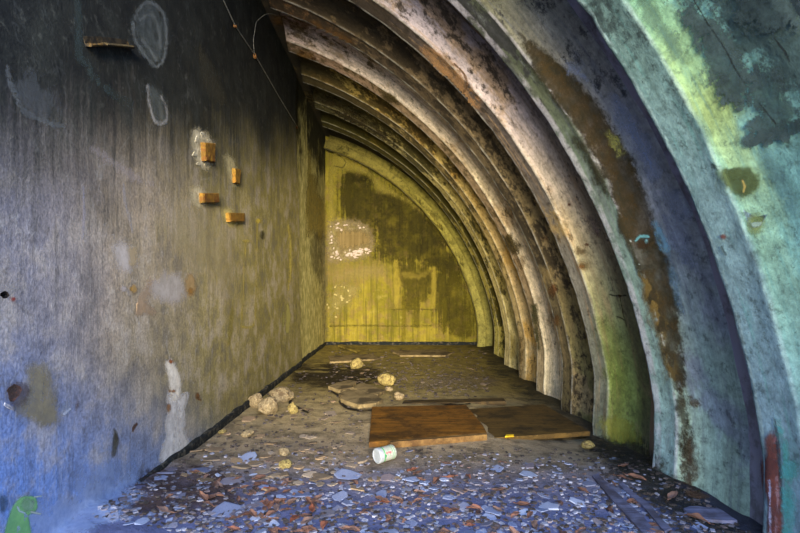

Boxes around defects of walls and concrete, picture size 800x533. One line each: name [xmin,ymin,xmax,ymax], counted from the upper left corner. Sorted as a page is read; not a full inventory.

leakage [394,259,475,337]
rust [520,35,709,499]
leakage [160,359,188,462]
rust [761,421,784,533]